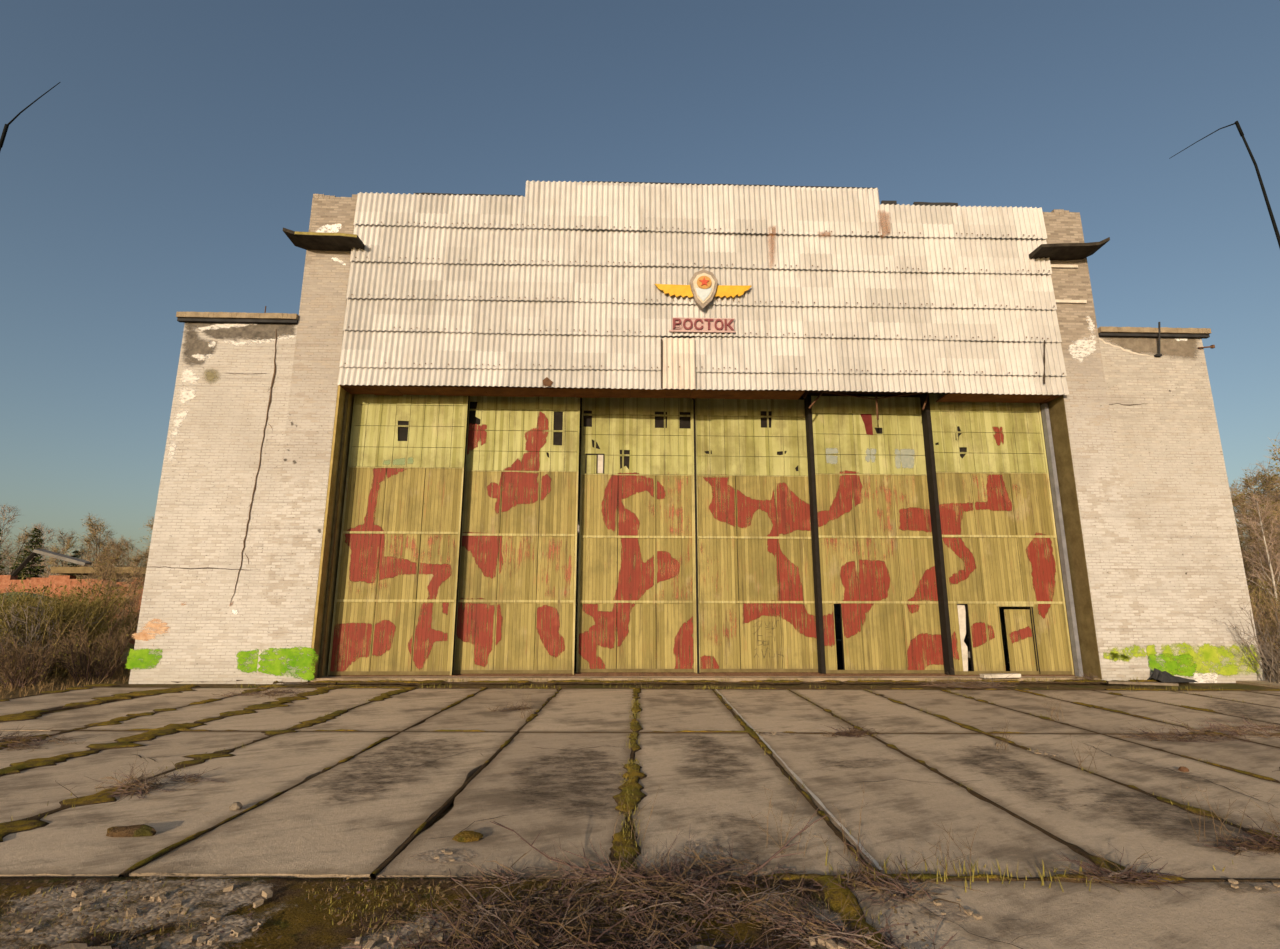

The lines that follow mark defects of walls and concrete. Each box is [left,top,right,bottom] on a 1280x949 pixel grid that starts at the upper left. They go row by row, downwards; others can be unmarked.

water stain [183,323,295,365]
peeling [1066,316,1097,363]
crack [154,329,277,603]